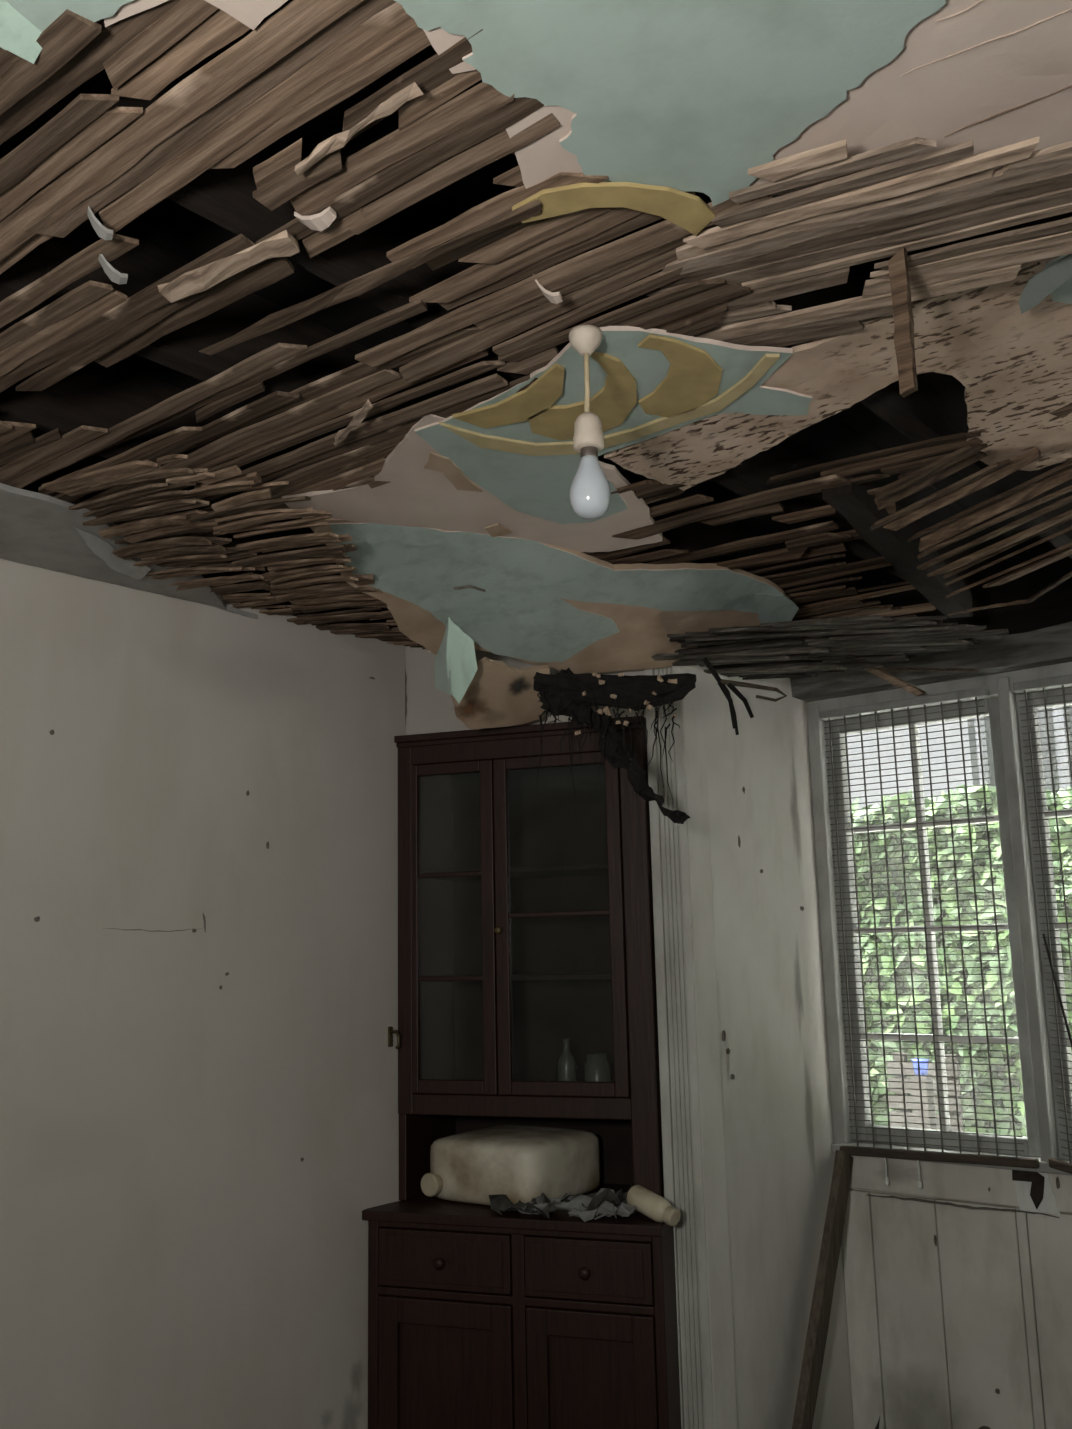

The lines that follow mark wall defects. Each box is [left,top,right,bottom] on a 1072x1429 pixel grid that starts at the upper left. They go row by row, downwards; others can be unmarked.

peeling [0,0,42,64]
peeling [104,0,169,27]
peeling [205,0,287,30]
peeling [423,27,465,55]
peeling [449,61,475,74]
peeling [750,0,1072,195]
peeling [506,105,583,189]
flaking render [911,254,1072,471]
flaking render [41,314,899,704]